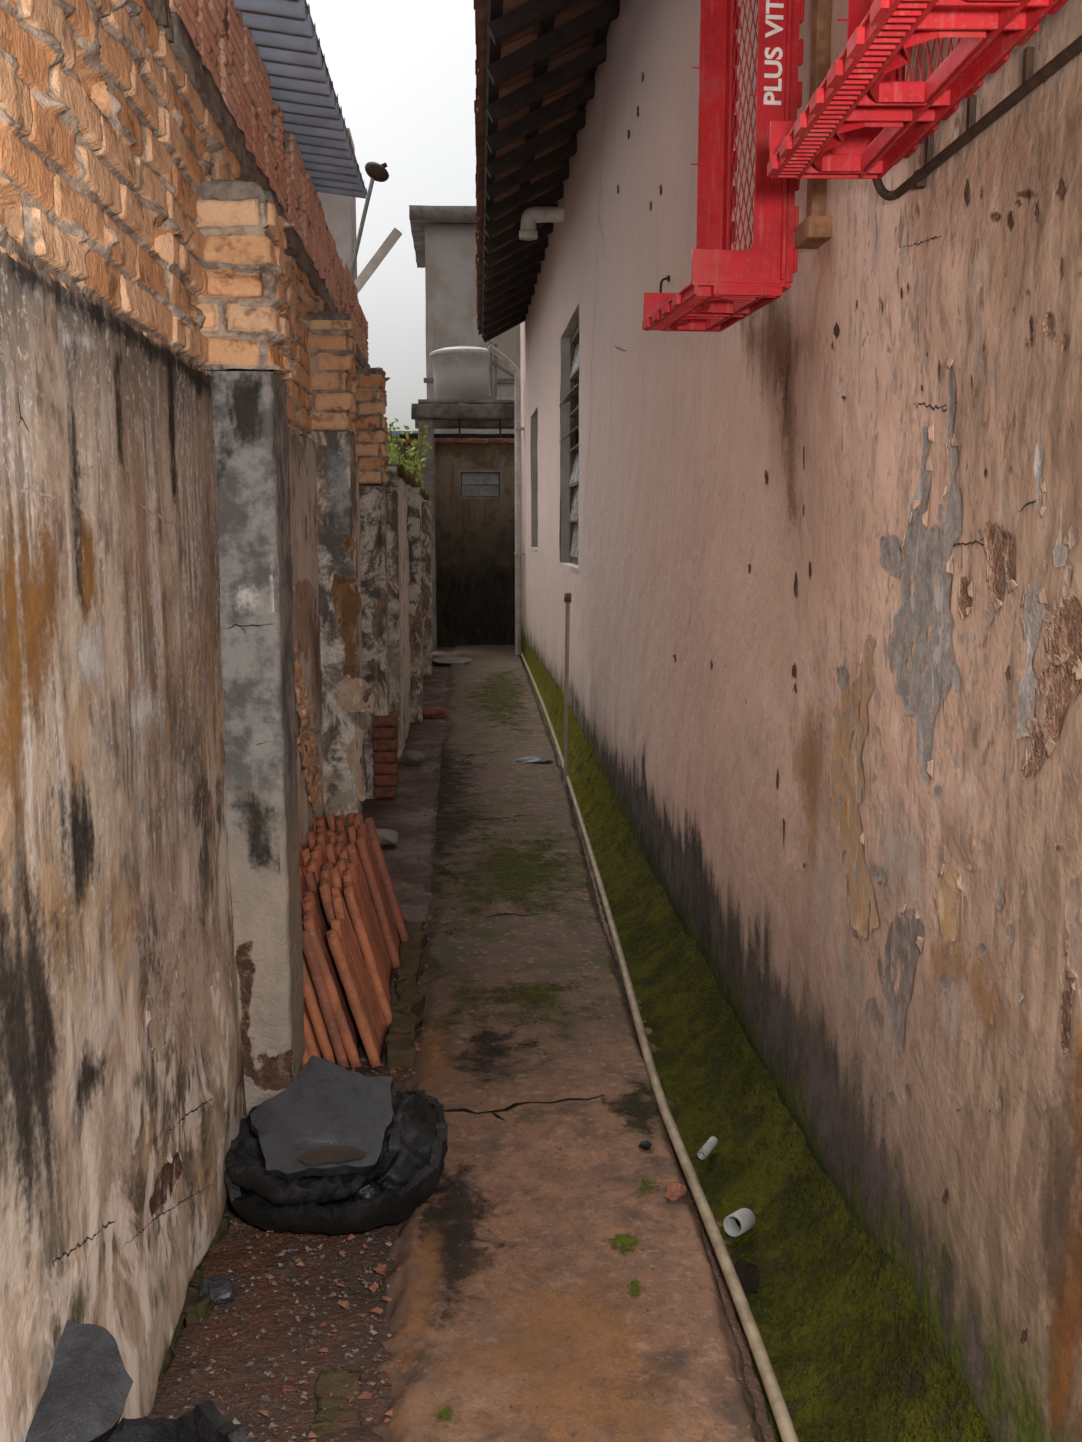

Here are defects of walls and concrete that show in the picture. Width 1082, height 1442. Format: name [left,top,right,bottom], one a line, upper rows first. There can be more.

damp [0,514,58,808]
damp [52,780,95,906]
damp [68,406,103,690]
damp [12,257,262,563]
flaking render [294,648,323,816]
spalling [331,574,399,810]
spalling [794,561,812,598]
peeling [831,352,1082,1054]
peeling [1012,289,1080,361]
damp [0,867,59,1225]
crack [444,1095,604,1121]
damp [570,688,994,1409]